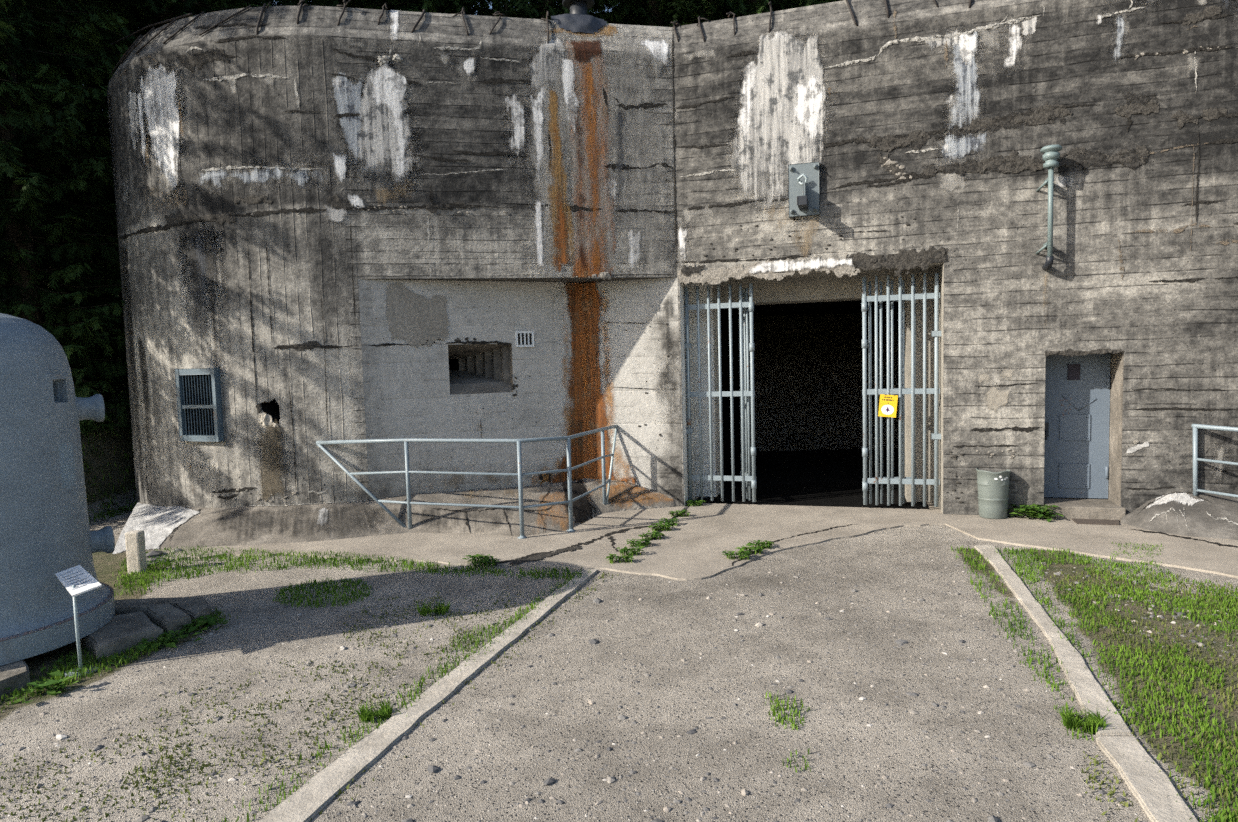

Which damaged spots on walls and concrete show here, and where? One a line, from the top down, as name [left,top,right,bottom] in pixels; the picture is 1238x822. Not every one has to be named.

rust [532,25,671,524]
spalling [678,246,948,285]
spalling [256,398,280,428]